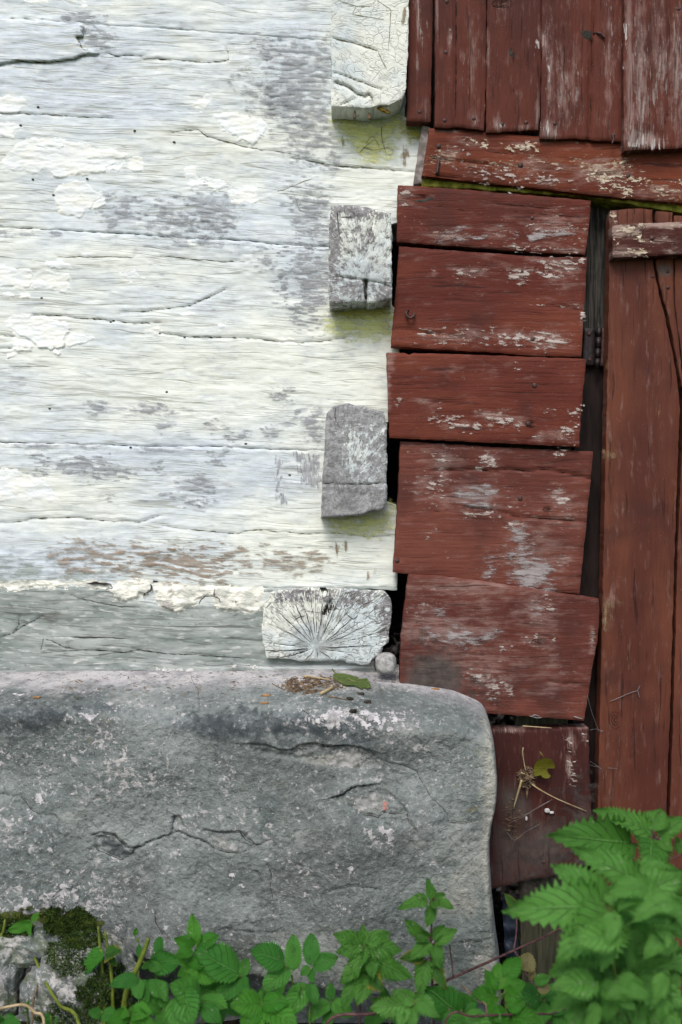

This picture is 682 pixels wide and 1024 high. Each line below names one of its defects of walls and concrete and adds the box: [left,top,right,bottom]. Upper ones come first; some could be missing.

peeling [0,95,147,219]
peeling [191,92,268,147]
leakage [226,28,422,340]
peeling [436,137,572,193]
peeling [580,134,682,198]
peeling [3,313,96,359]
leakage [0,507,395,587]
spalling [0,578,265,615]
crack [2,592,407,707]
crack [94,816,273,899]